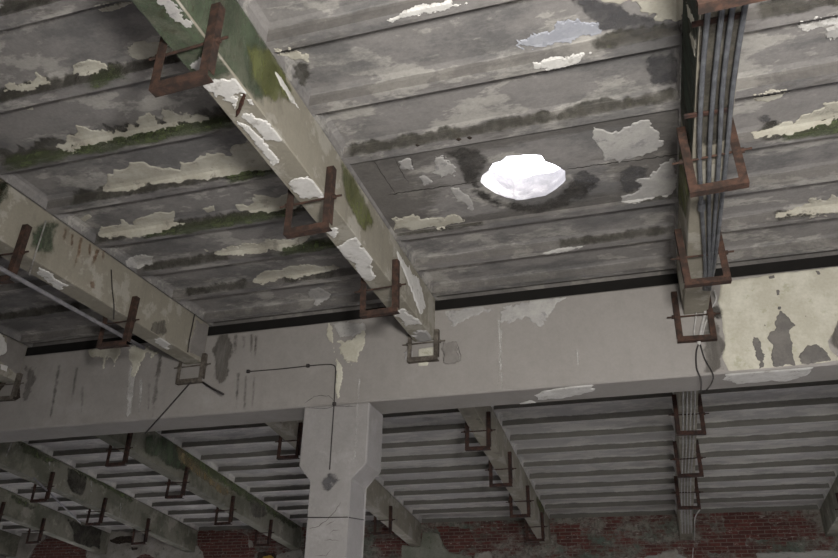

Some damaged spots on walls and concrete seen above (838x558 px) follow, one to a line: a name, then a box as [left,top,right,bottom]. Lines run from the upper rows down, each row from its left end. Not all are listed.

leakage [572,0,666,48]
leakage [350,52,677,156]
peeling [55,109,210,154]
peeling [103,78,282,192]
peeling [592,120,664,163]
leakage [447,148,600,213]
leakage [620,166,646,193]
peeling [98,211,185,239]
leakage [212,334,237,383]
peeling [326,321,366,398]
spalling [197,531,276,558]